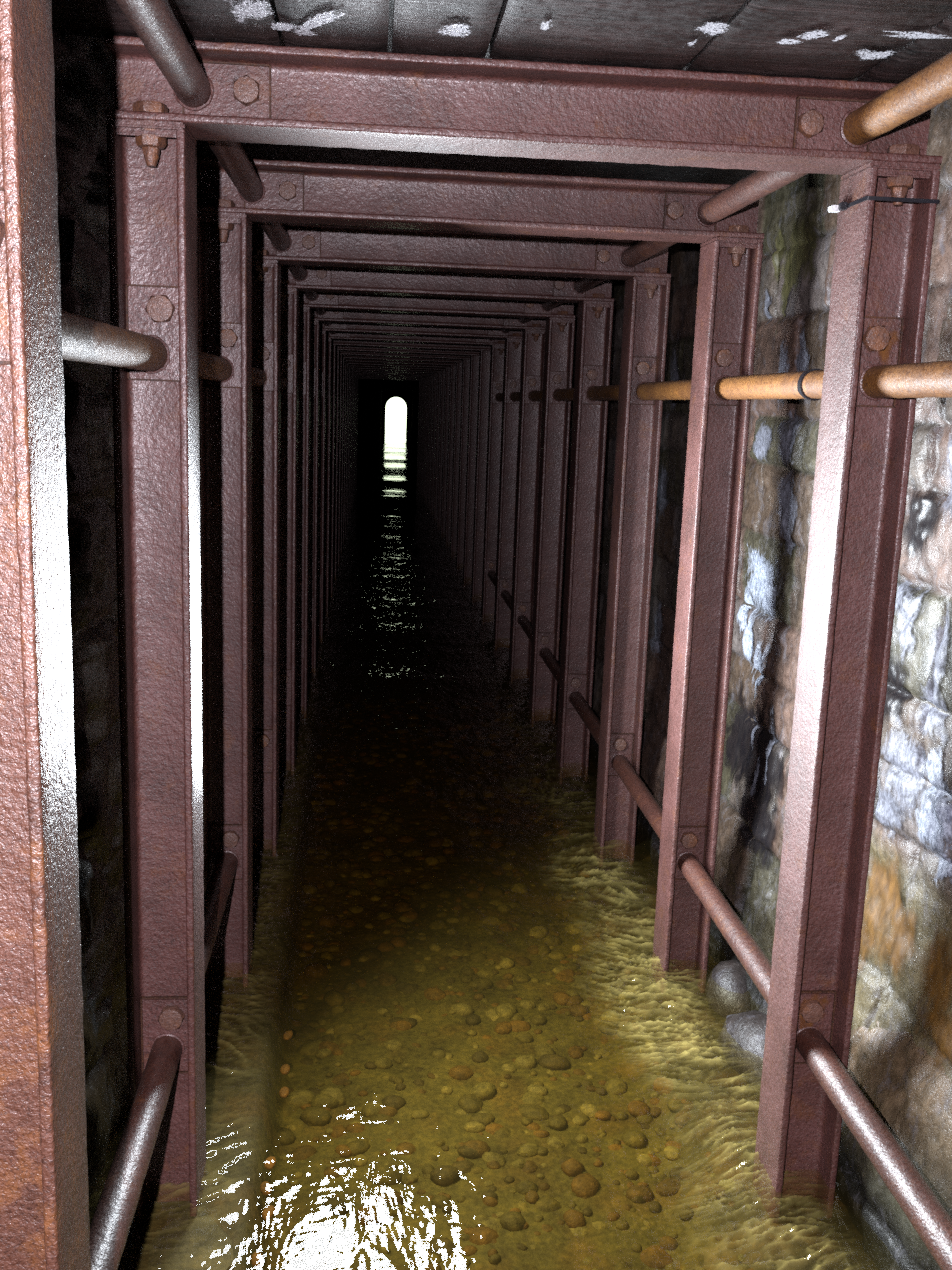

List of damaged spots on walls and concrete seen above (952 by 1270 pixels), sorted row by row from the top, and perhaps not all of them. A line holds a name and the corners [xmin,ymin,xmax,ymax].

water stain [223,0,345,36]
water stain [688,22,729,46]
water stain [777,29,846,44]
water stain [857,31,951,60]